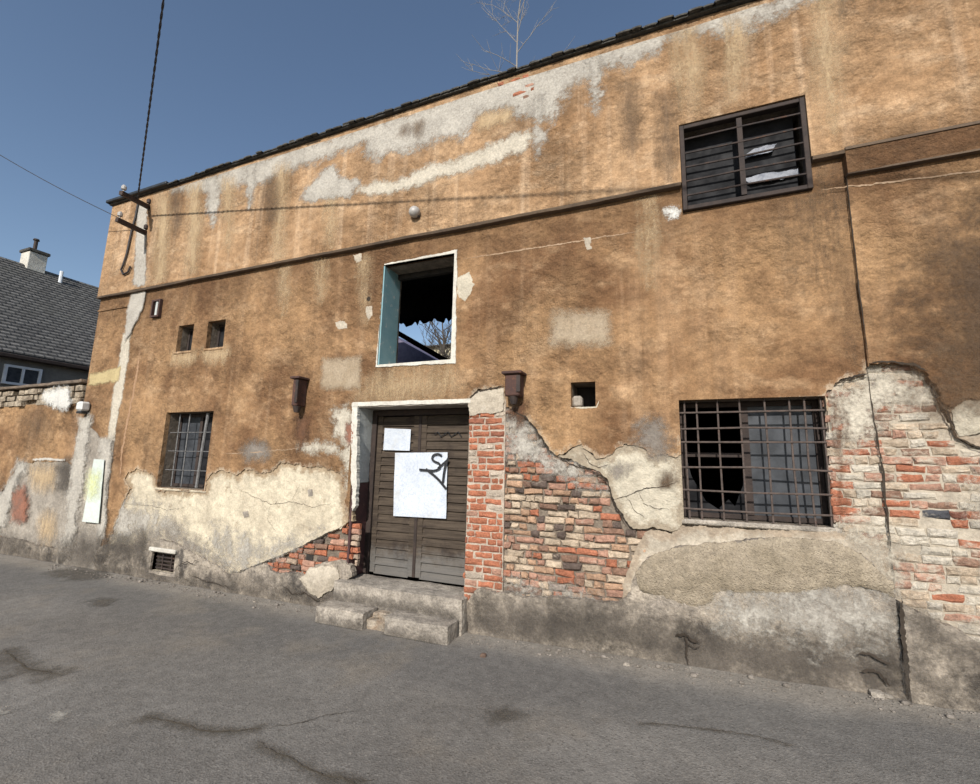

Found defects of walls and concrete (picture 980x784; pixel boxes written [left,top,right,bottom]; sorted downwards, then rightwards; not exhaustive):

flaking render [169,0,813,228]
flaking render [457,272,475,301]
damp [0,497,452,618]
flaking render [109,404,362,574]
flaking render [463,365,980,643]
crack [822,168,980,699]
damp [467,587,980,708]